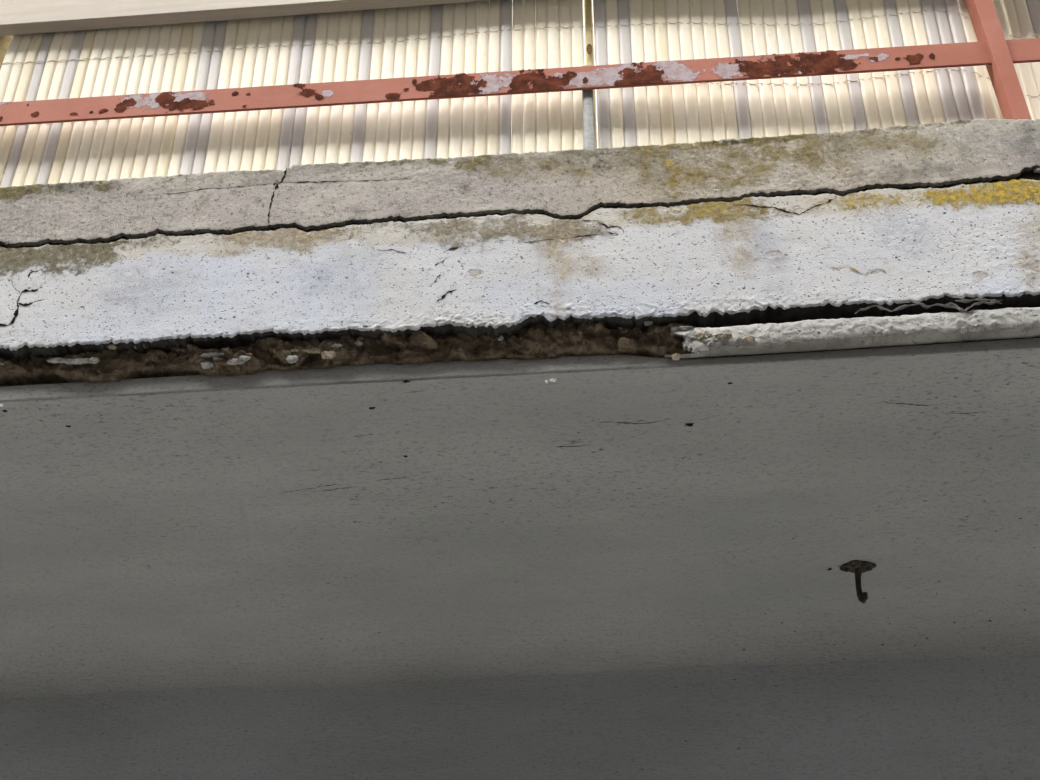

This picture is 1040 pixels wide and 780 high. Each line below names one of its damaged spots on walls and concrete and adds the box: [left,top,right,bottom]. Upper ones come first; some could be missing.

corrosion [155,91,214,113]
corrosion [293,83,324,100]
corrosion [385,69,588,100]
corrosion [613,62,669,86]
corrosion [728,50,878,77]
corrosion [895,53,935,65]
crack [0,167,1040,326]
spalling [0,320,755,387]